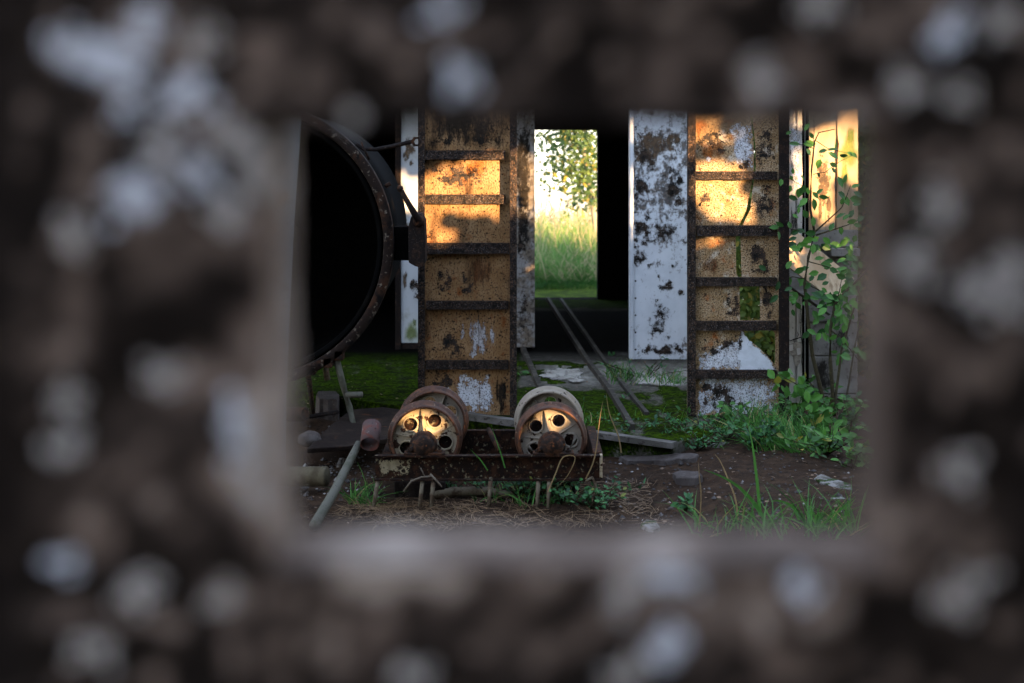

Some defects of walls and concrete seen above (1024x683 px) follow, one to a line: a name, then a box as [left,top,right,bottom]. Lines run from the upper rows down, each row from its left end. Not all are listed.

peeling [729,127,754,170]
peeling [460,321,495,358]
peeling [448,374,494,412]
peeling [696,331,776,416]